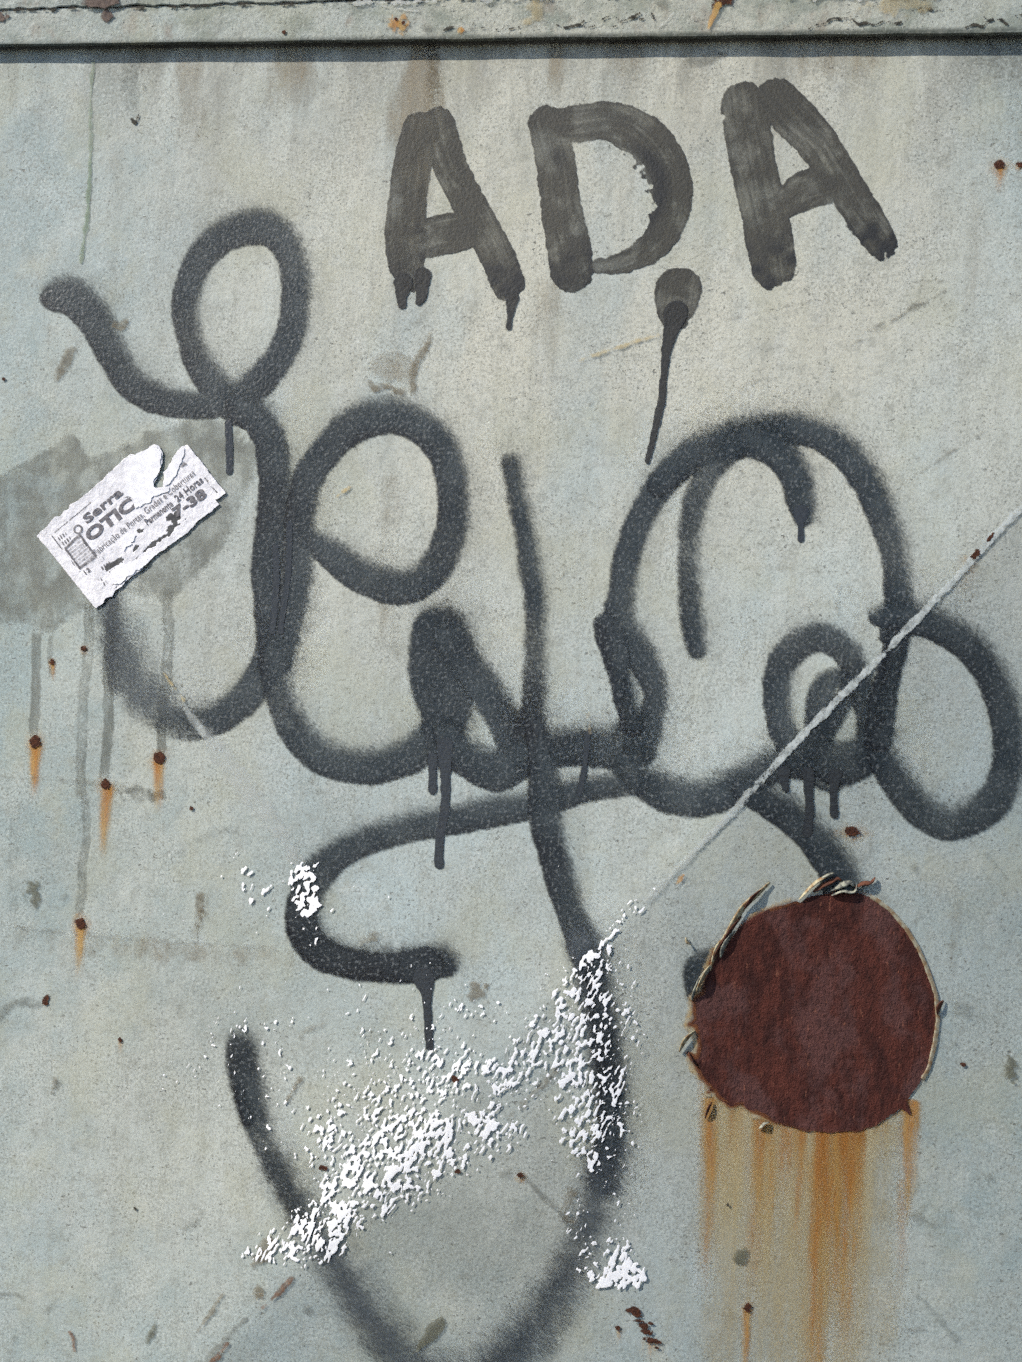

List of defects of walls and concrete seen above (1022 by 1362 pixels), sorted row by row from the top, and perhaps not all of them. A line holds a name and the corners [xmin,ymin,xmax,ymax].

corrosion [29,735,41,784]
corrosion [153,751,165,789]
corrosion [100,778,113,845]
corrosion [75,918,86,958]
corrosion [679,872,944,1361]